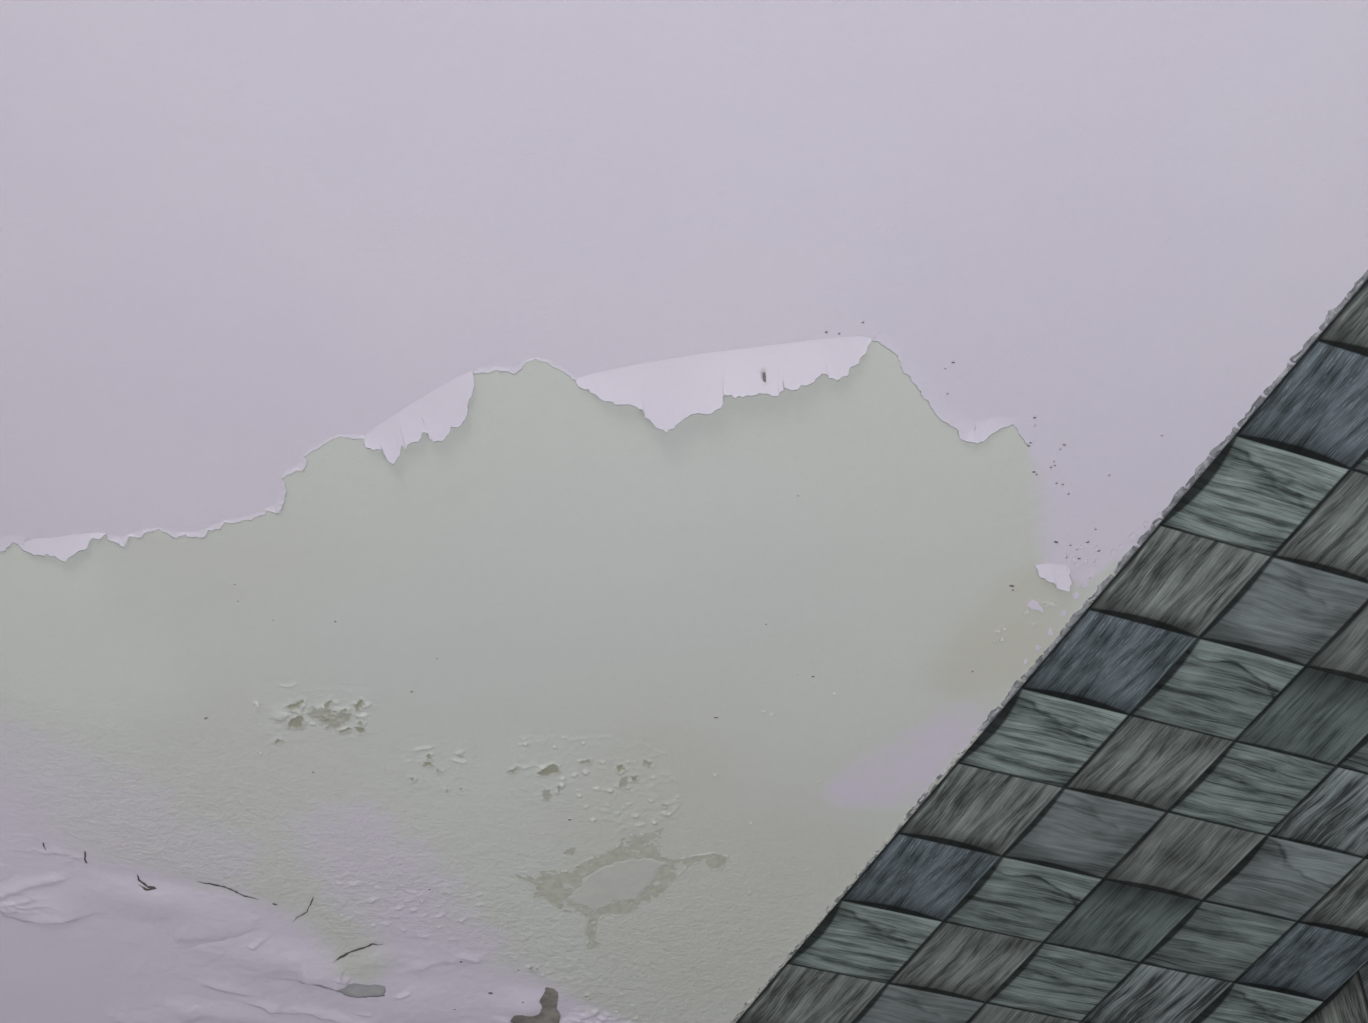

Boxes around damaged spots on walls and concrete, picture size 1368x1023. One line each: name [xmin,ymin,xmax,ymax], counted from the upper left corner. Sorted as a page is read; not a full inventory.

peeling [0,321,1162,665]
damp [0,388,1107,1023]
peeling [266,893,286,912]